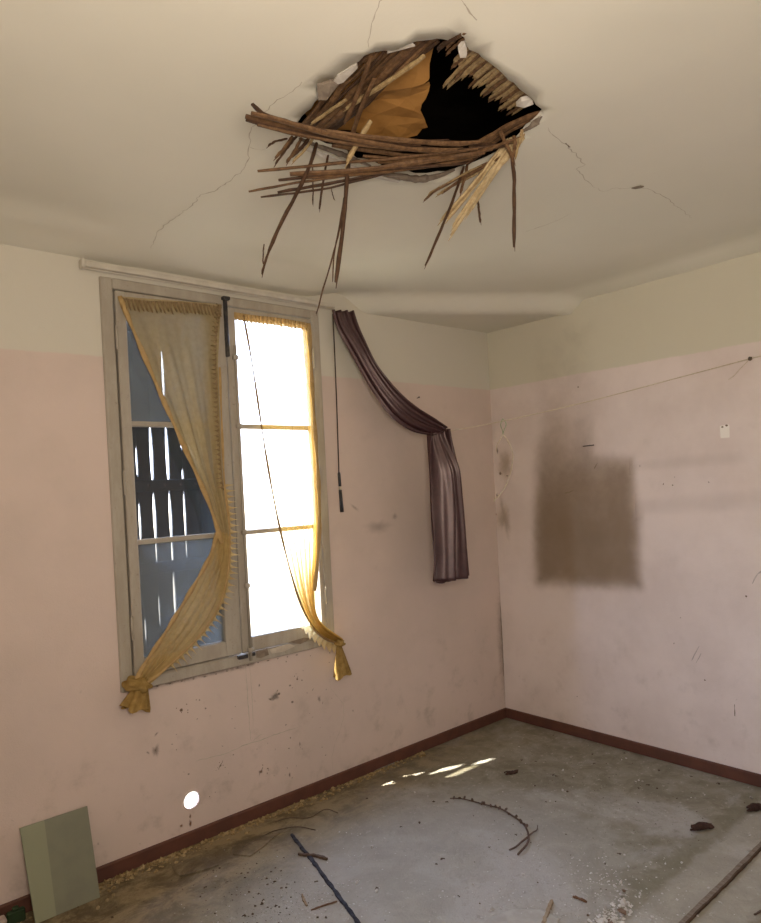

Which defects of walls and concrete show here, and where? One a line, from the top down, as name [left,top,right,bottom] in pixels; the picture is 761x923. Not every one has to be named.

flaking render [458,40,467,58]
flaking render [317,63,358,100]
flaking render [516,96,534,108]
flaking render [299,143,357,168]
crack [548,128,687,215]
water stain [539,470,635,581]